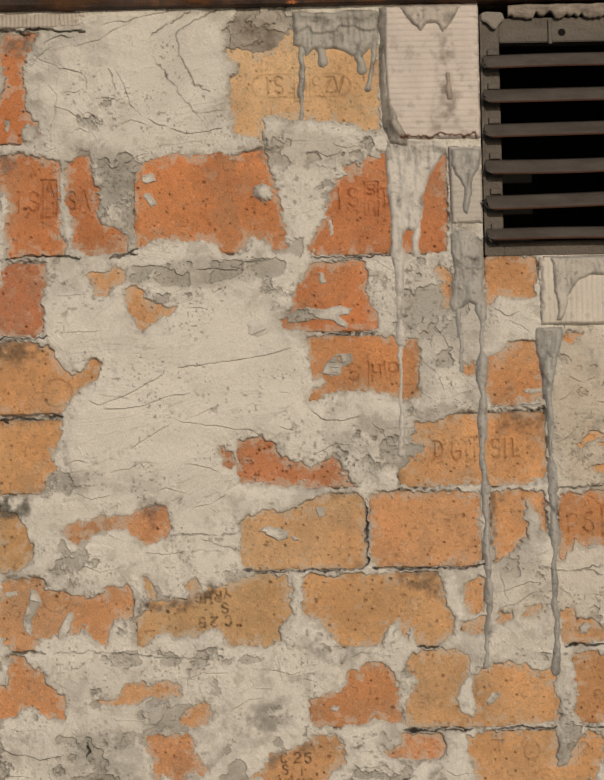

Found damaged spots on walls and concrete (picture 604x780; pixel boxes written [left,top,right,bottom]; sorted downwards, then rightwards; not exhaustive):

crack [1,27,85,36]
leakage [297,47,306,121]
spalling [226,30,380,140]
leakage [316,49,328,68]
leakage [354,39,378,92]
spalling [403,155,449,255]
spalling [0,32,288,496]
spalling [281,154,421,401]
leakage [455,309,465,373]
leakage [475,284,494,669]
spalling [0,341,604,780]
leakage [544,401,562,676]